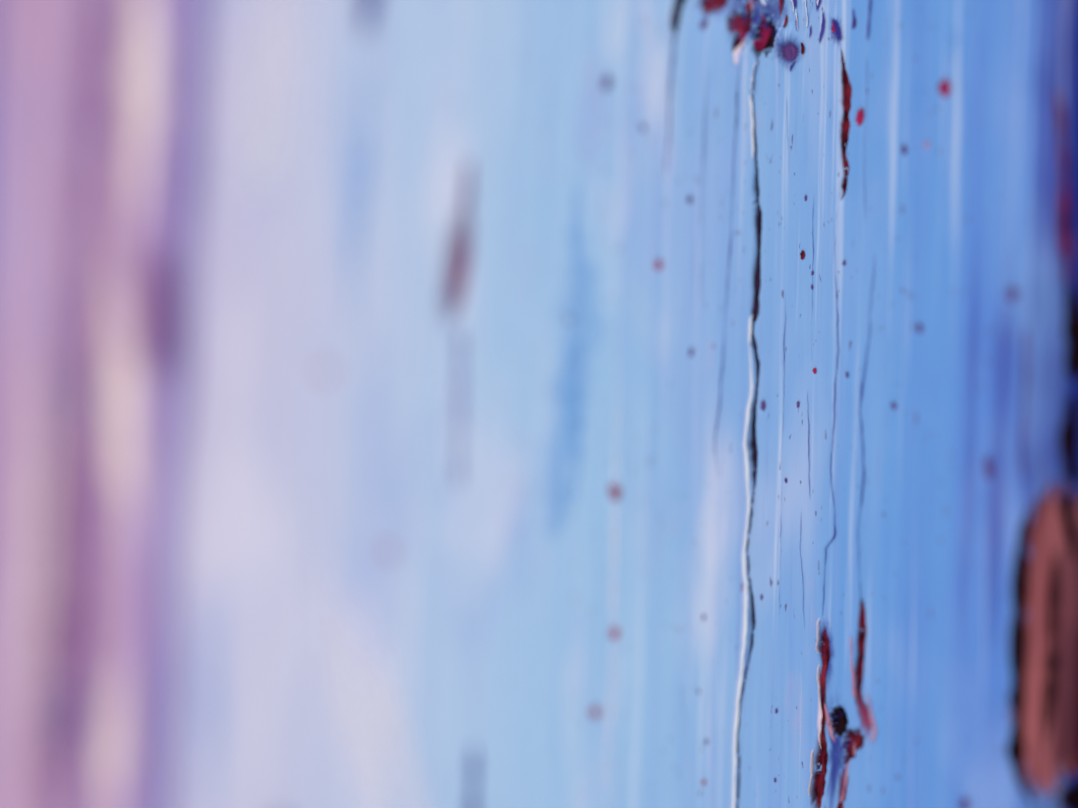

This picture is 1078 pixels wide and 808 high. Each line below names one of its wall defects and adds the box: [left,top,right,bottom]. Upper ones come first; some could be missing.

crack [666,0,686,166]
peeling [733,39,744,65]
spalling [790,0,871,42]
crack [715,66,786,808]
crack [780,50,870,616]
spalling [808,600,876,808]